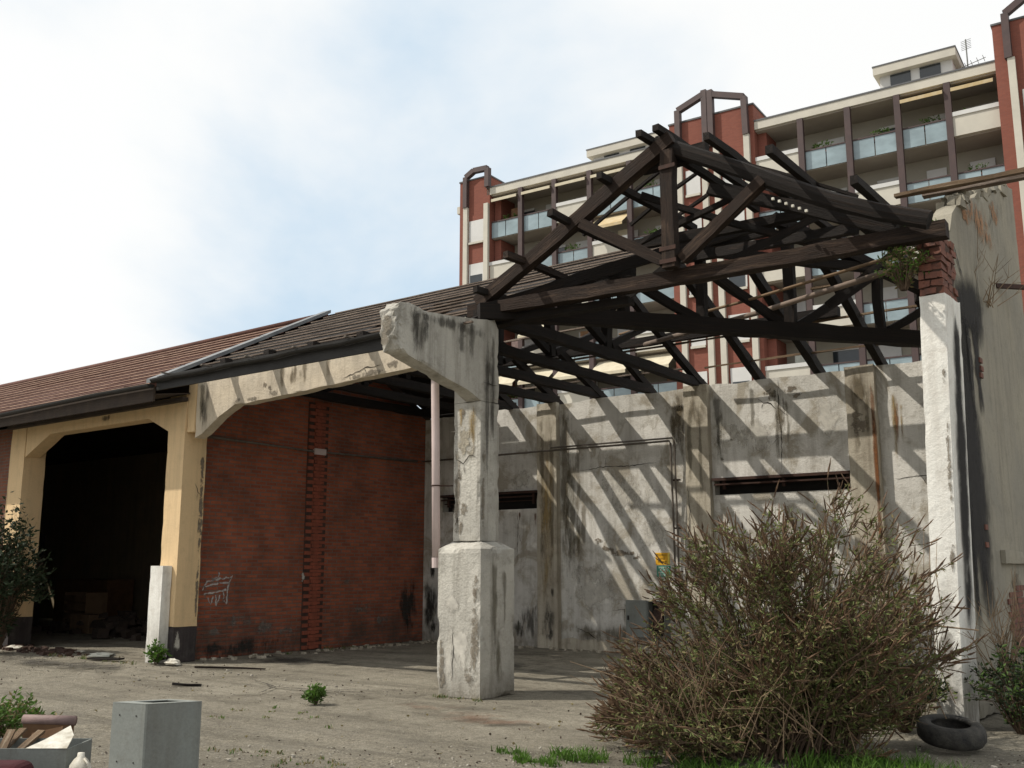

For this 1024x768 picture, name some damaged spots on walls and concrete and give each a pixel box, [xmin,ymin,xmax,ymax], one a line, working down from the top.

leakage [413,313,429,341]
corrosion [870,389,881,544]
leakage [955,280,995,619]
leakage [515,608,553,639]